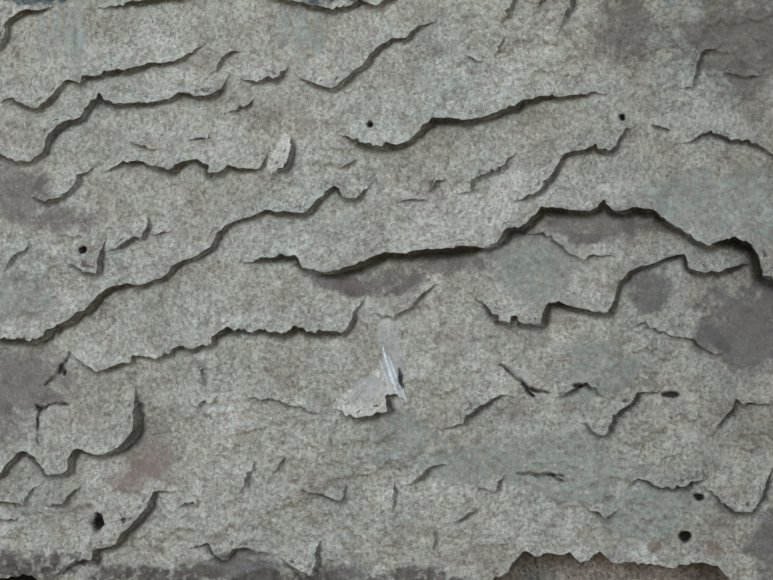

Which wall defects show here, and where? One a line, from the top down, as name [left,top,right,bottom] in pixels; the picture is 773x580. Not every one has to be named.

flaking render [0,0,773,372]
flaking render [0,368,136,475]
flaking render [242,361,407,418]
flaking render [439,365,516,429]
crack [501,365,546,396]
flaking render [553,353,662,436]
flaking render [710,377,773,437]
spalling [0,472,43,520]
spalling [45,475,82,506]
flaking render [52,461,328,576]
flaking render [383,441,451,513]
flaking render [628,441,773,513]